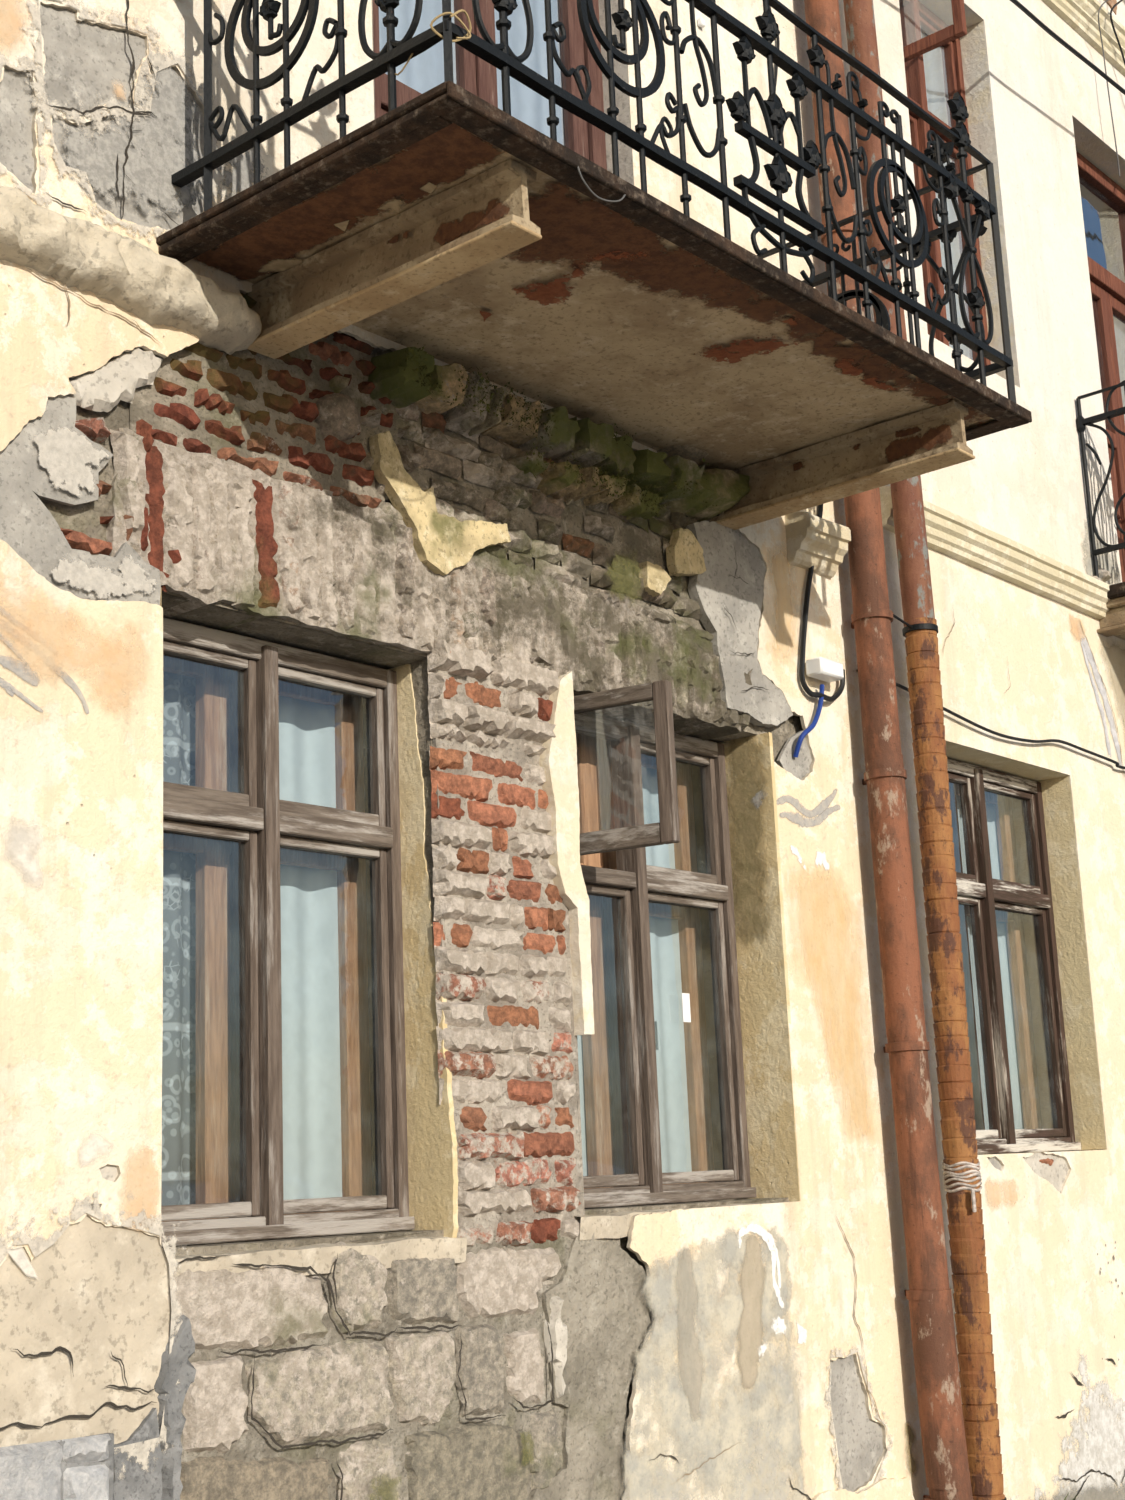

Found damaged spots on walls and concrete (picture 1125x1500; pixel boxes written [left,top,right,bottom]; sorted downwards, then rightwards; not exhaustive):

crack [47,0,155,219]
spalling [0,0,227,242]
spalling [240,292,257,309]
spalling [777,730,812,780]
spalling [0,332,750,1500]
crack [0,1346,157,1430]
crack [652,1442,741,1485]
spalling [811,1347,915,1500]
crack [1061,1469,1125,1500]